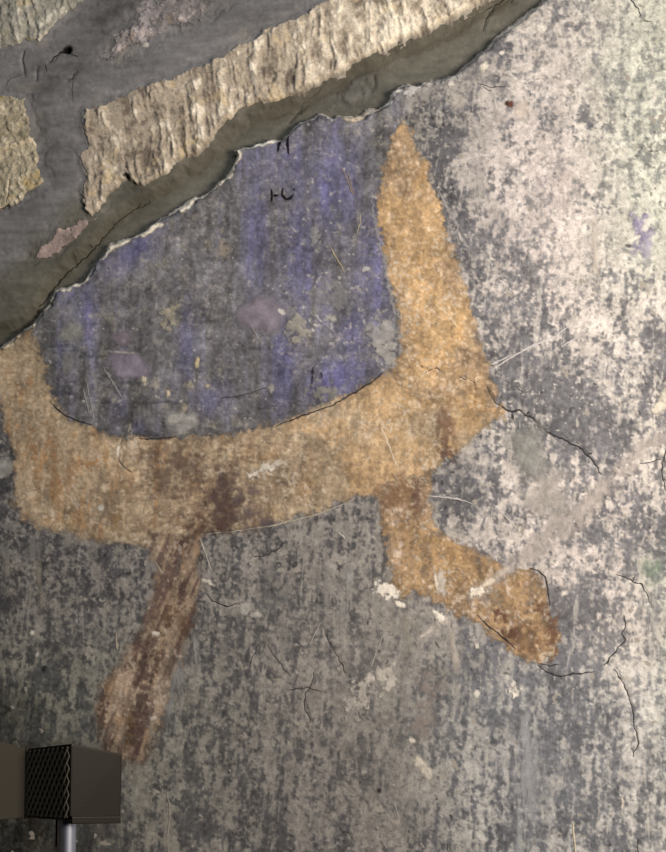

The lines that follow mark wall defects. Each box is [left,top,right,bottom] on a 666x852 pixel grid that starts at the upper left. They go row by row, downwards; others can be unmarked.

spalling [102,0,207,58]
flaking render [487,10,538,55]
spalling [291,72,465,133]
flaking render [100,140,279,260]
flaking render [43,271,92,312]
spalling [159,304,180,331]
spalling [278,309,311,343]
spalling [365,309,409,371]
crack [459,376,602,475]
crack [249,643,321,722]
crack [538,616,639,756]